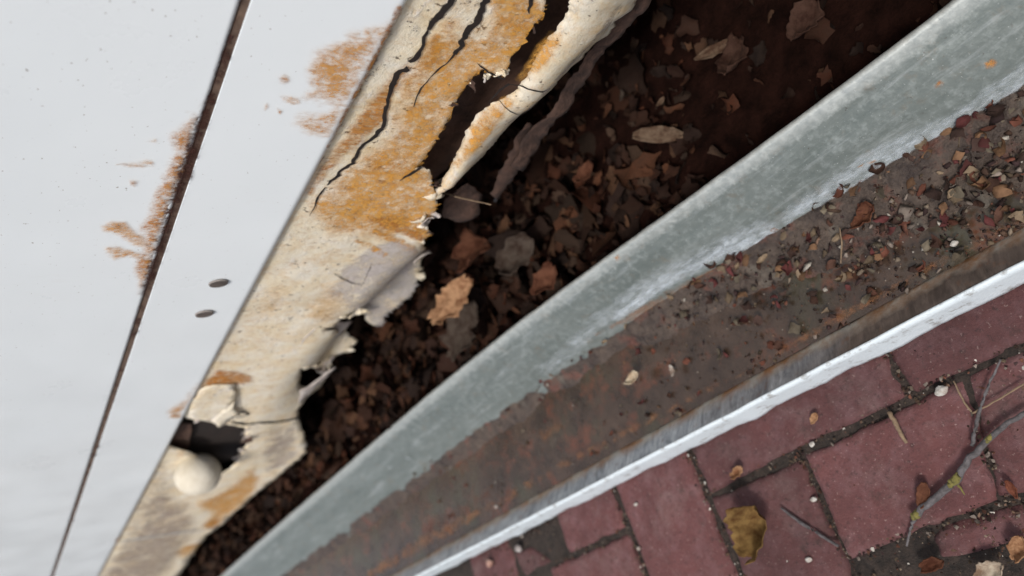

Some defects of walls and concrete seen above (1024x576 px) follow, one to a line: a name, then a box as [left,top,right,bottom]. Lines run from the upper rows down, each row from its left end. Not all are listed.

crack [309,0,546,216]
rust [304,0,651,257]
rust [107,35,233,292]
peeling [301,0,636,344]
peeling [188,383,241,427]
rust [206,371,250,385]
peeling [298,347,356,404]
peeling [232,429,253,460]
rust [201,471,259,529]